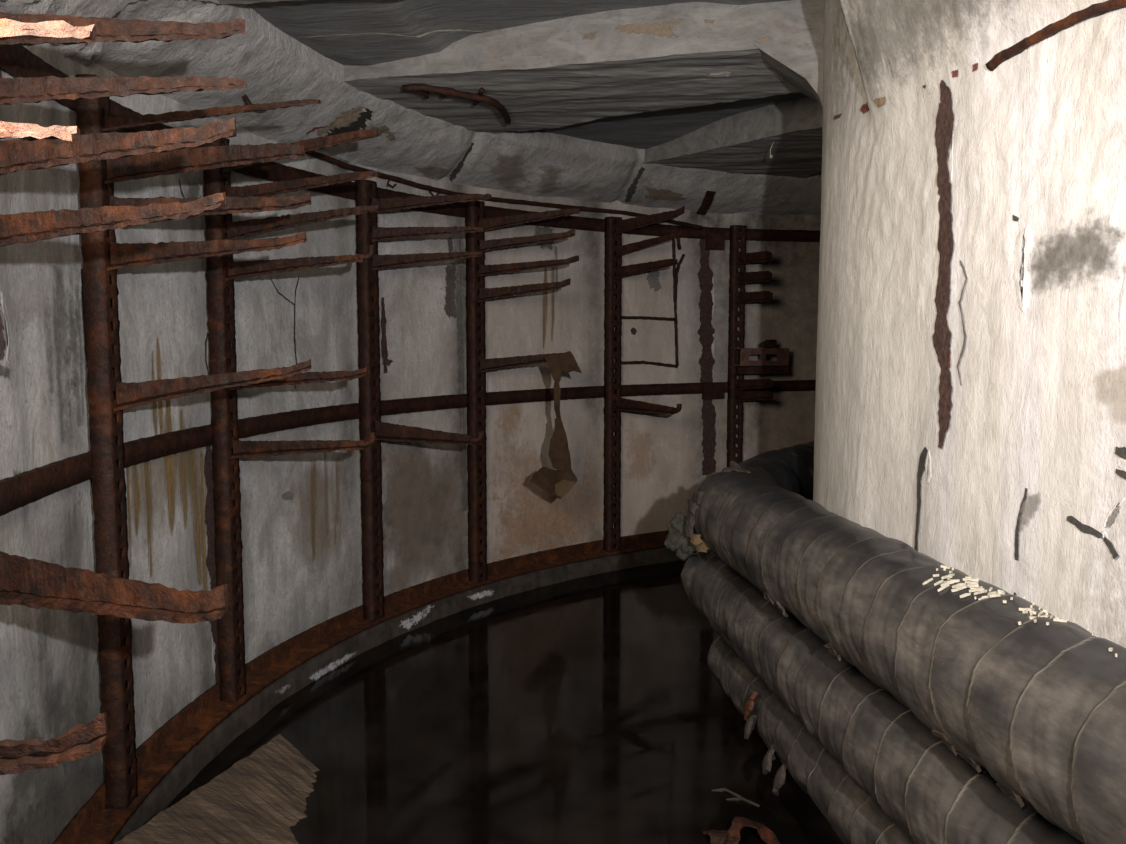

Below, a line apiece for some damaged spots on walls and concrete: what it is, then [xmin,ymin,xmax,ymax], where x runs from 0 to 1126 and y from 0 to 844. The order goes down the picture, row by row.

damp [1030,219,1120,289]
corrosion [543,267,554,348]
corrosion [152,339,161,381]
corrosion [153,400,183,435]
corrosion [127,462,153,575]
corrosion [165,449,207,591]